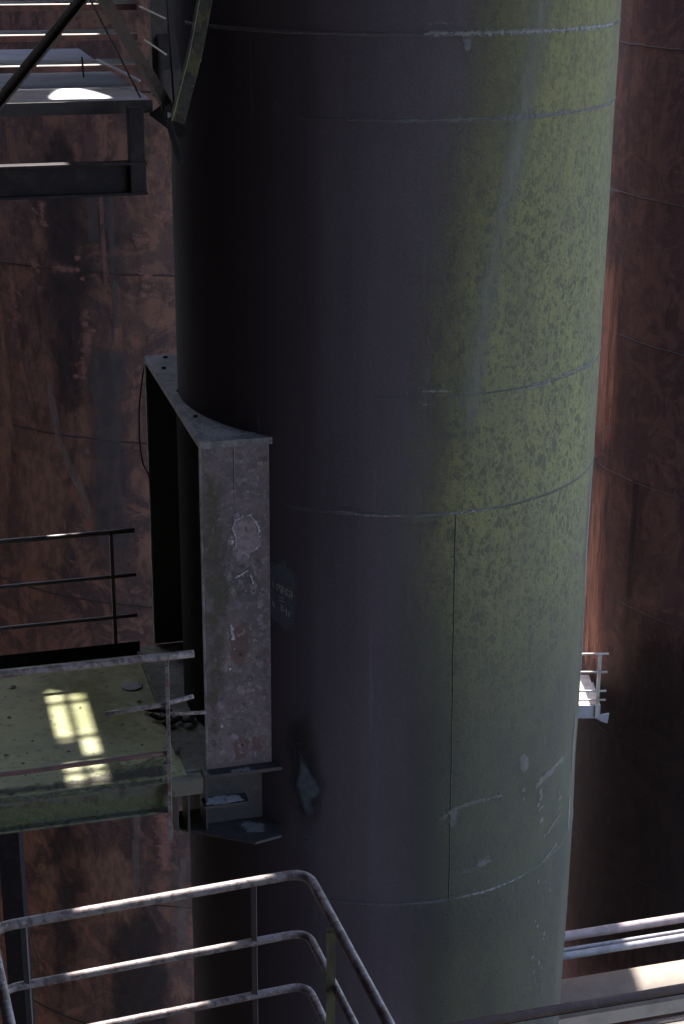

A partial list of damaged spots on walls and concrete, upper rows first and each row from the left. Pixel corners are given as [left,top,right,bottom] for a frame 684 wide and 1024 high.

rust [596,266,620,442]
peeling [204,456,271,760]
rust [585,477,604,657]